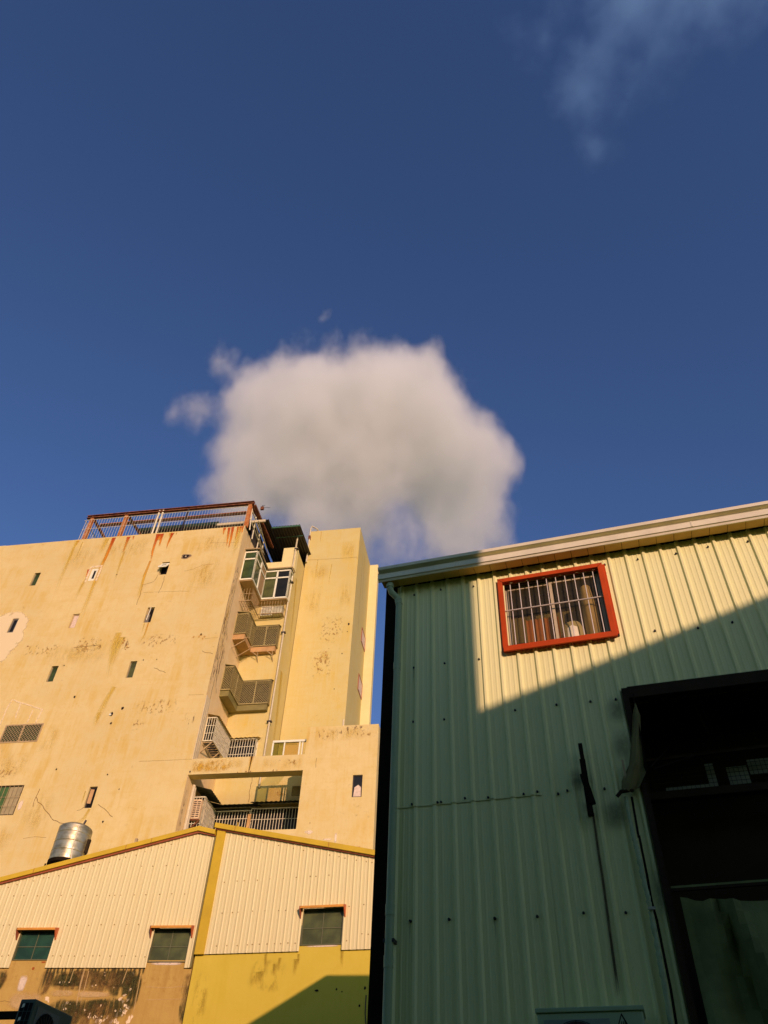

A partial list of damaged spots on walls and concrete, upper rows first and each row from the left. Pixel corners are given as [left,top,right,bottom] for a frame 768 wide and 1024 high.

corrosion [81,536,134,593]
corrosion [141,533,177,588]
corrosion [223,526,244,546]
damp [42,968,145,1024]